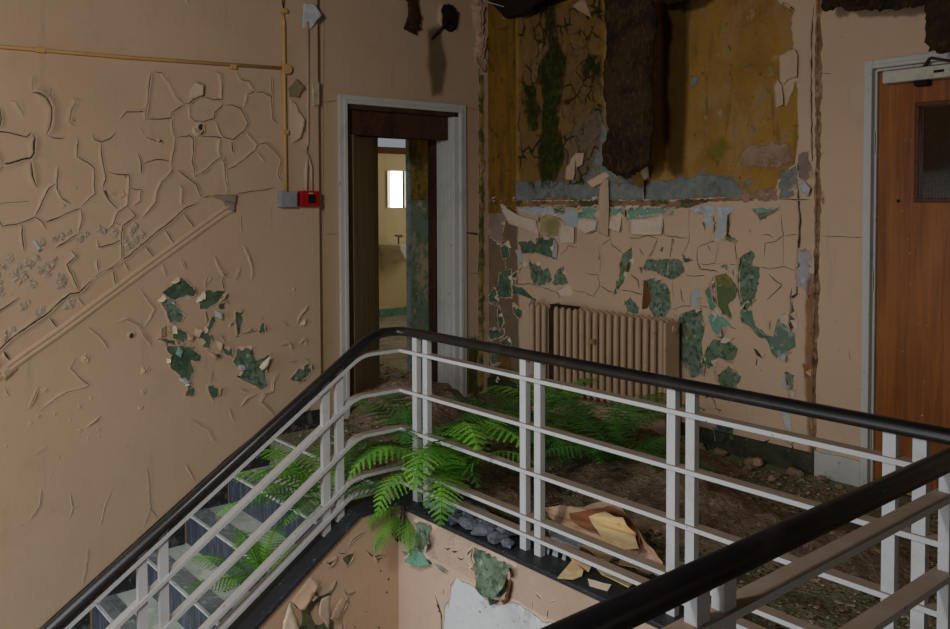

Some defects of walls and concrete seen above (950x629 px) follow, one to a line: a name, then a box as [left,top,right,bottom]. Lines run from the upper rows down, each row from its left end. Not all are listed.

peeling [431,0,823,403]
peeling [710,424,735,438]
peeling [780,411,796,432]
flaking render [810,418,835,455]